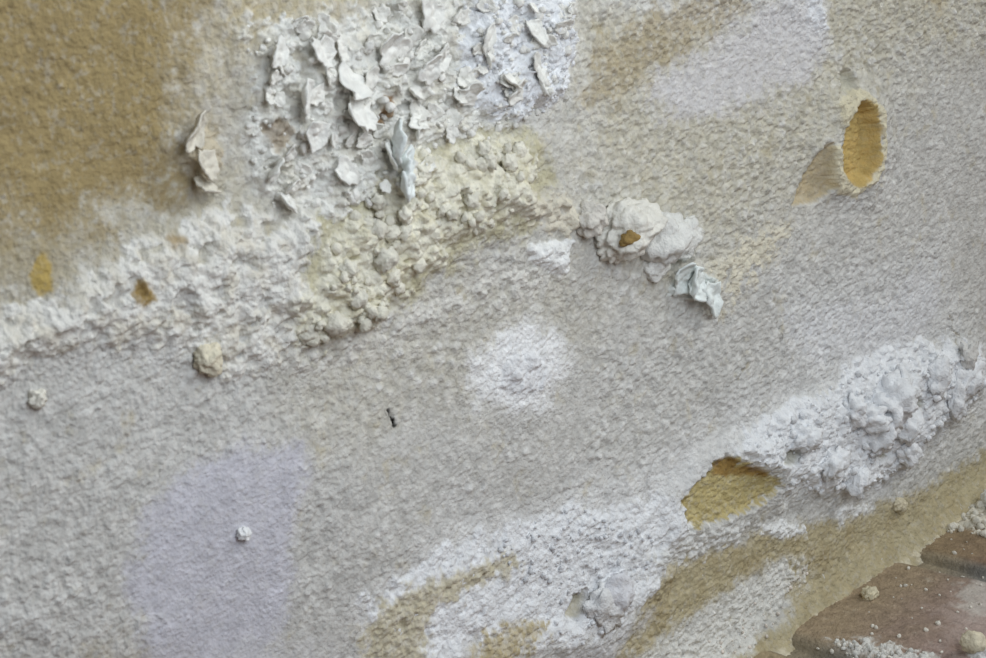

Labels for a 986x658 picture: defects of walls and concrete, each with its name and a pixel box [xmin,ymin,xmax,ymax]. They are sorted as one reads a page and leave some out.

peeling [177,0,582,239]
flaking render [791,68,889,209]
water stain [0,0,839,436]
water stain [346,324,986,658]
flaking render [680,449,805,533]
water stain [15,621,127,658]
spalling [564,586,588,624]